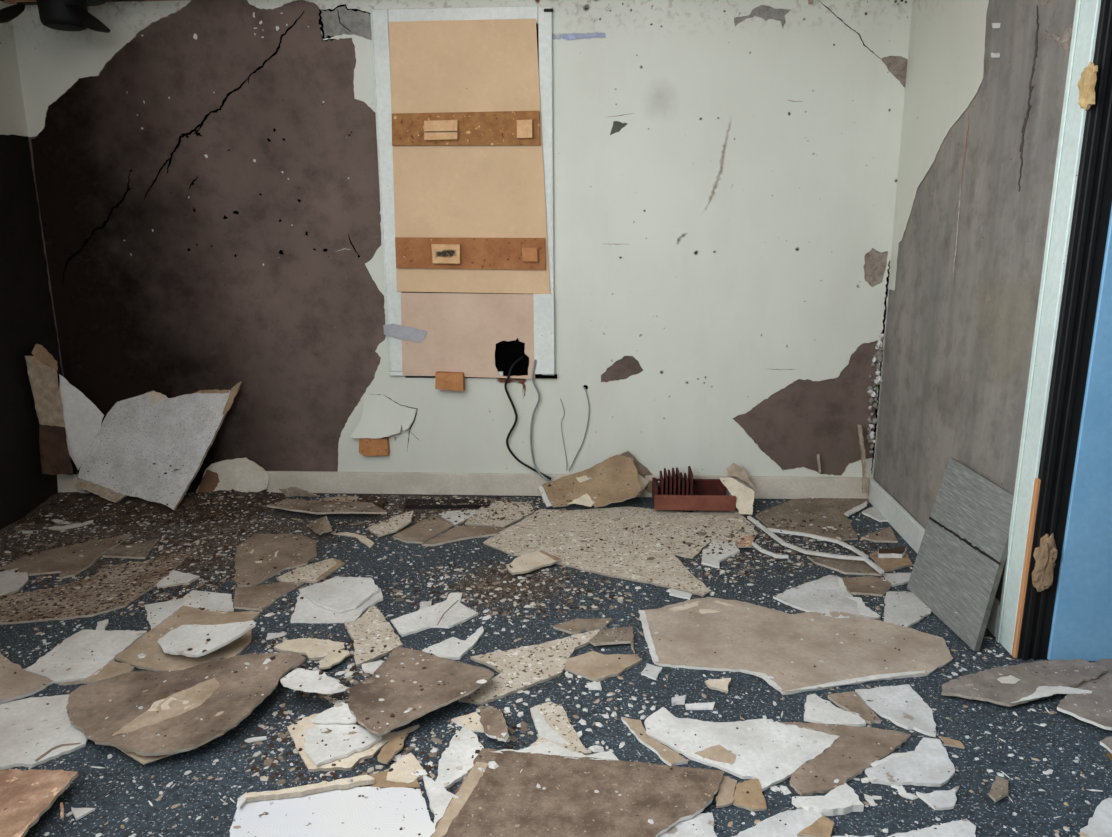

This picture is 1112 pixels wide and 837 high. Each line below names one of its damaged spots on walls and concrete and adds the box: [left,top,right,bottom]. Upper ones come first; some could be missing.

flaking render [0,135,63,528]
crack [62,11,304,289]
flaking render [89,0,386,472]
flaking render [601,356,643,382]
flaking render [733,0,1098,529]
crack [1018,6,1039,192]
flaking render [995,564,1005,601]